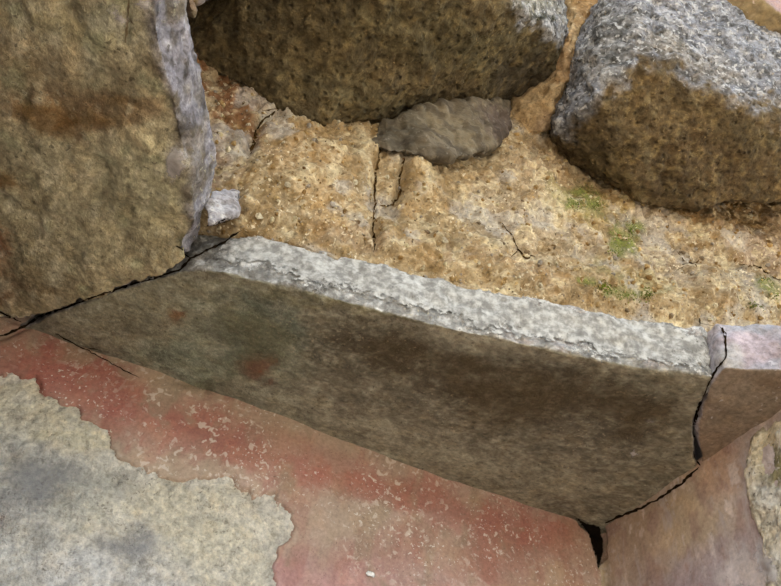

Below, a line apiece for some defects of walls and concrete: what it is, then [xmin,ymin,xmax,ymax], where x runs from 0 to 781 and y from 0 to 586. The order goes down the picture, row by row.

crack [372,149,405,250]
crack [0,230,242,336]
crack [57,334,138,377]
crack [605,318,727,524]
peeling [0,372,294,586]